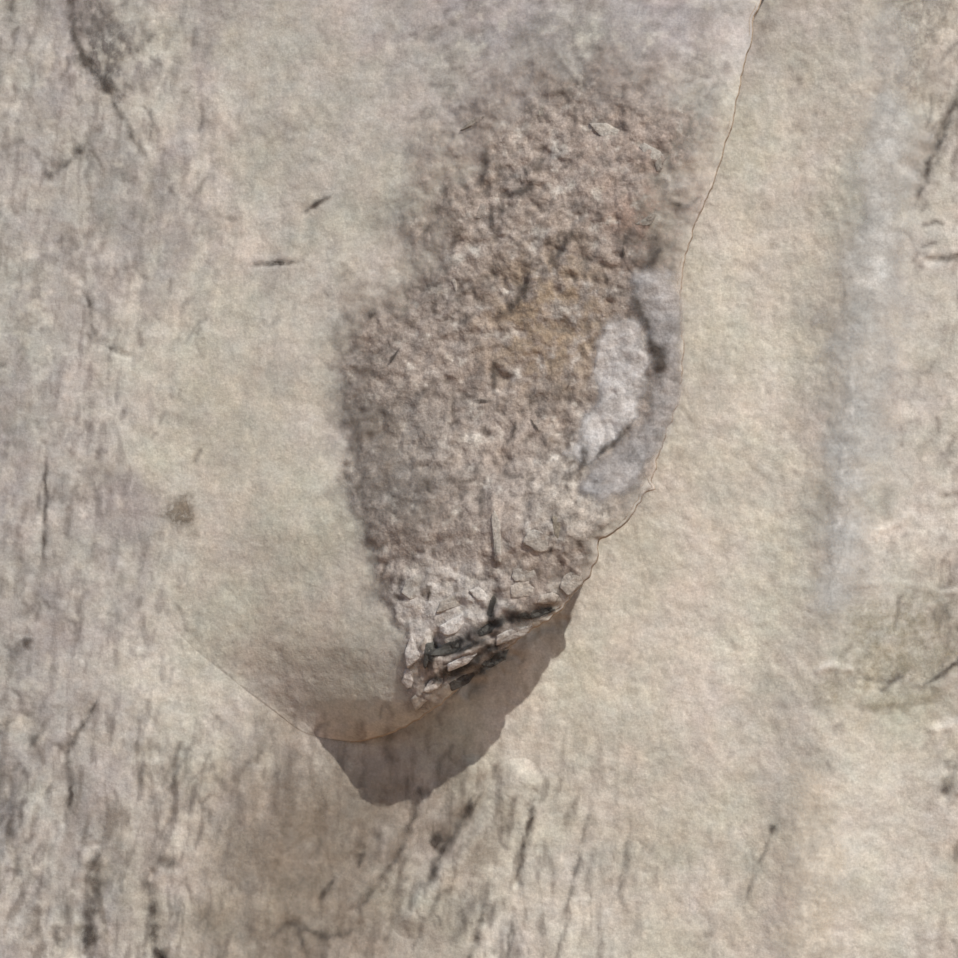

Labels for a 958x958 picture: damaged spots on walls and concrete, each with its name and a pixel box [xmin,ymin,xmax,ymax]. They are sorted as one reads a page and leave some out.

peeling [128,0,762,742]